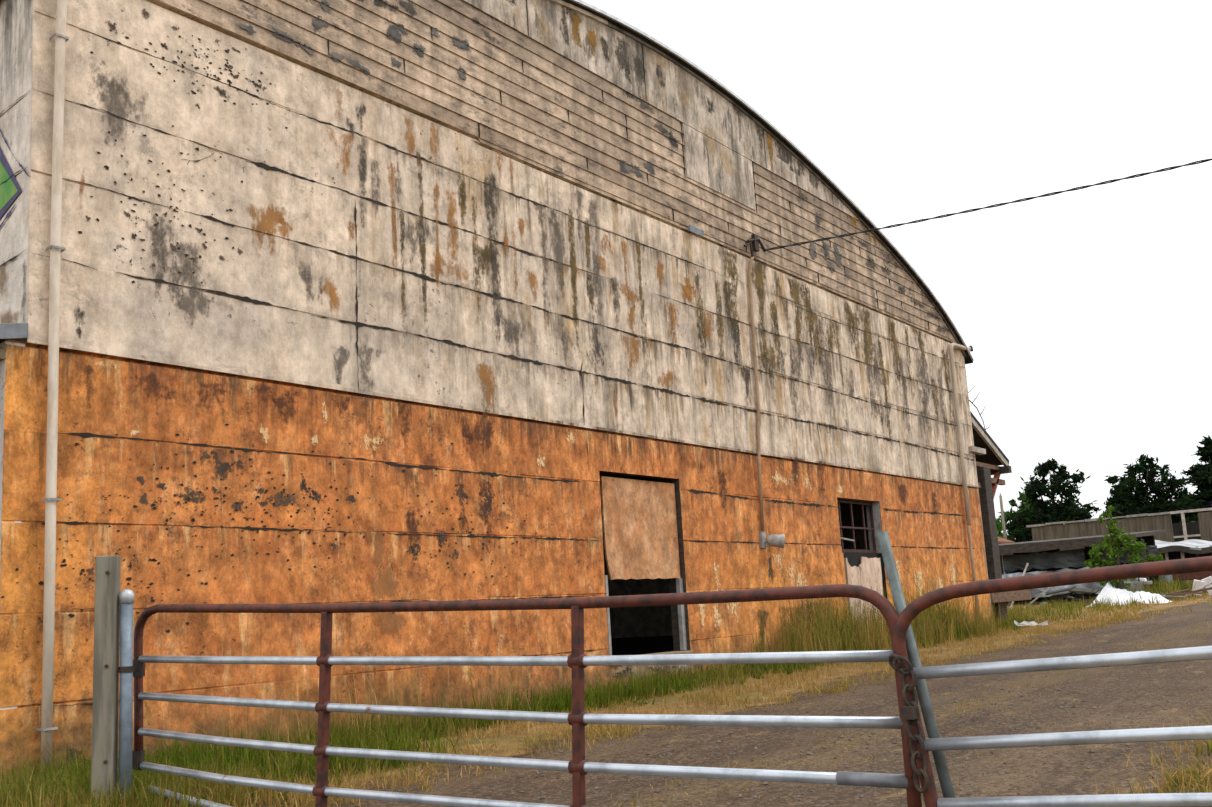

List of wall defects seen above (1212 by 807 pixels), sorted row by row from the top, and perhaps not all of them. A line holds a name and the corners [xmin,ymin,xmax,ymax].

damp [97,74,144,143]
damp [347,104,379,226]
damp [149,217,210,325]
corrosion [250,205,293,252]
damp [334,346,380,387]
damp [400,152,429,331]
corrosion [478,364,495,415]
damp [457,174,525,356]
damp [538,191,620,365]
damp [636,244,647,351]
damp [695,274,752,404]
damp [751,261,951,446]